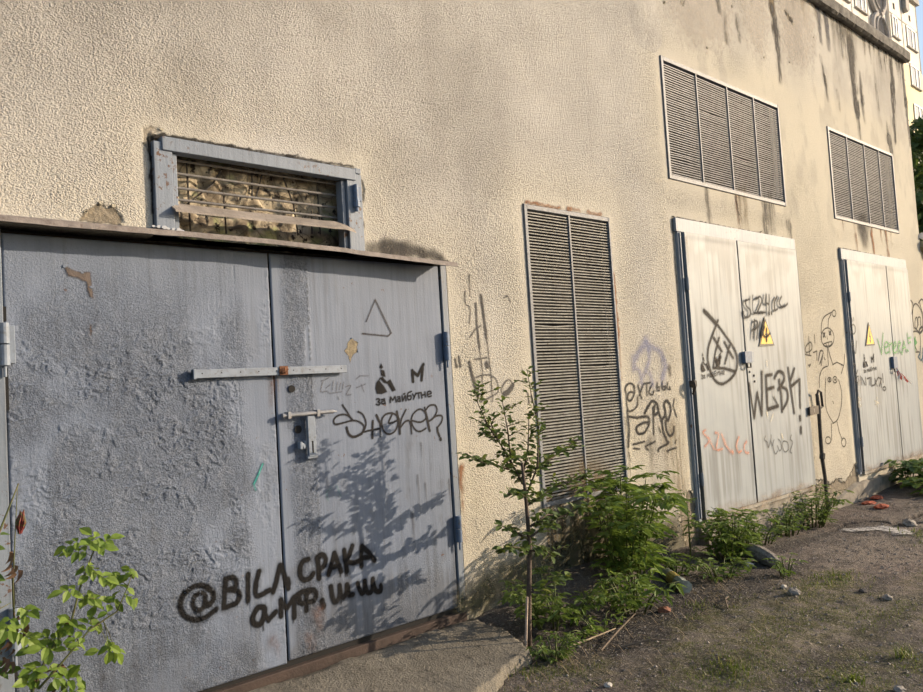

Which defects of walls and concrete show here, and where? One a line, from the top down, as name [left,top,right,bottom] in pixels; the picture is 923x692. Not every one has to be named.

damp [769,0,782,81]
damp [815,6,910,154]
spalling [80,201,124,226]
damp [763,194,774,234]
damp [858,215,867,242]
peeling [62,264,93,298]